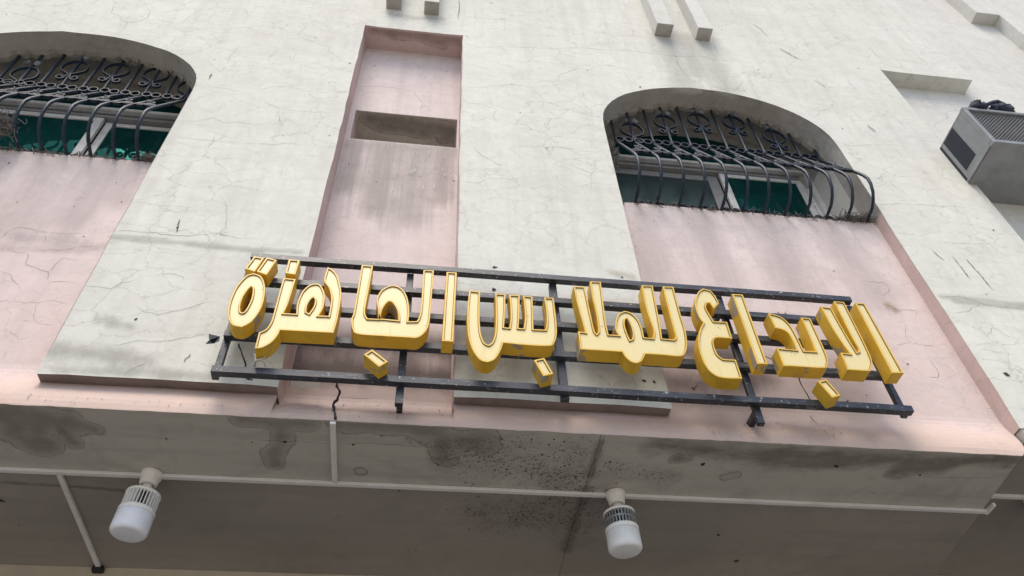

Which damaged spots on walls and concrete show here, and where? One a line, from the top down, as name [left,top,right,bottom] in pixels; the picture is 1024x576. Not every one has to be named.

damp [455,435,627,537]